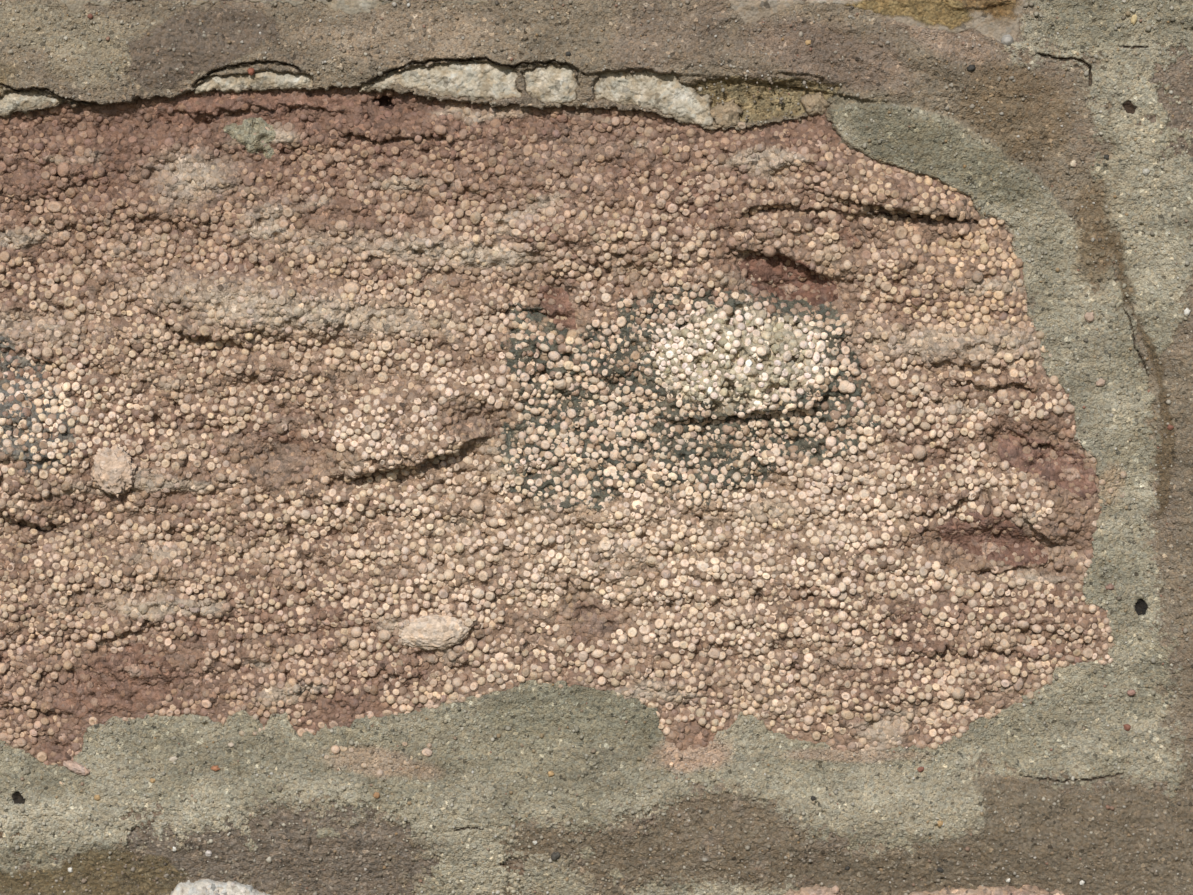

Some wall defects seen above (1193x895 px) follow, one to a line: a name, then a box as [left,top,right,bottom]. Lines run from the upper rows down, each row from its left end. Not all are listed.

peeling [0,91,62,118]
peeling [154,60,578,126]
crack [363,57,578,84]
peeling [594,71,744,128]
crack [1038,53,1092,85]
spalling [738,254,838,306]
spalling [537,284,577,330]
spalling [452,403,502,440]
spalling [996,432,1098,500]
spalling [935,510,1048,568]
spalling [569,598,620,638]
spalling [52,643,184,720]